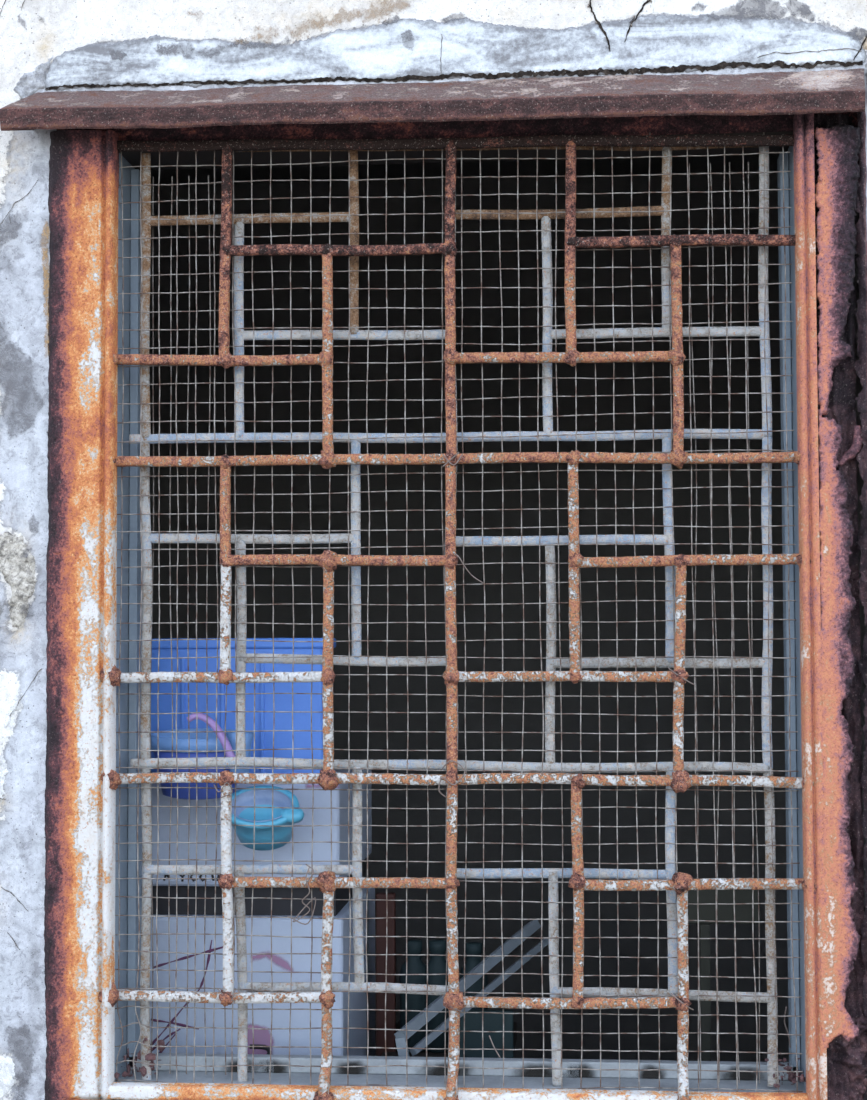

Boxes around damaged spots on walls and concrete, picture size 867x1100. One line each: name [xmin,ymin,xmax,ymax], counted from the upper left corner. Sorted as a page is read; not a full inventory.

leakage [156,0,414,58]
crack [45,0,867,90]
leakage [849,27,867,40]
leakage [0,217,21,245]
corrosion [814,113,852,283]
corrosion [42,223,50,348]
leakage [0,324,43,437]
spalling [0,532,37,629]
corrosion [818,277,866,1018]
corrosion [827,1045,850,1100]